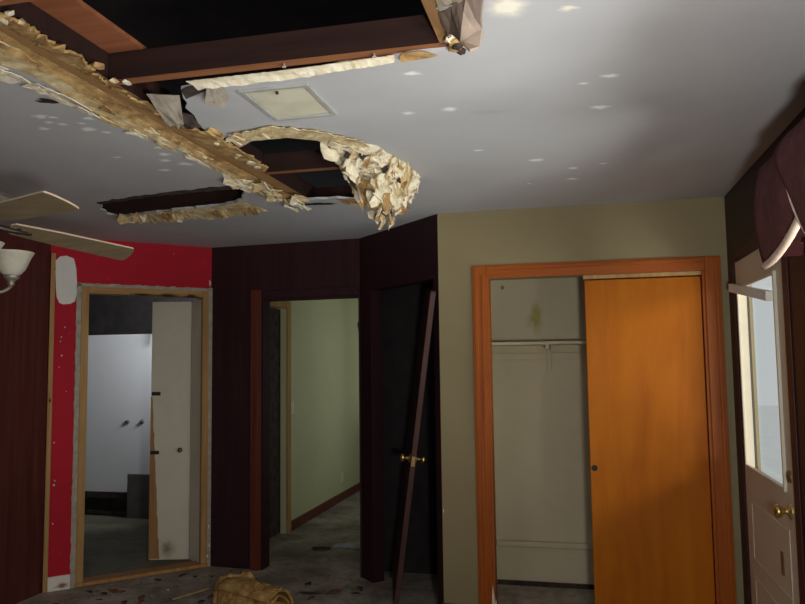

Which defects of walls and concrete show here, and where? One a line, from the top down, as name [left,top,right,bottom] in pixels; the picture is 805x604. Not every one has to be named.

spalling [0,10,163,120]
peeling [117,212,147,225]
spalling [174,125,311,212]
flaking render [320,141,413,230]